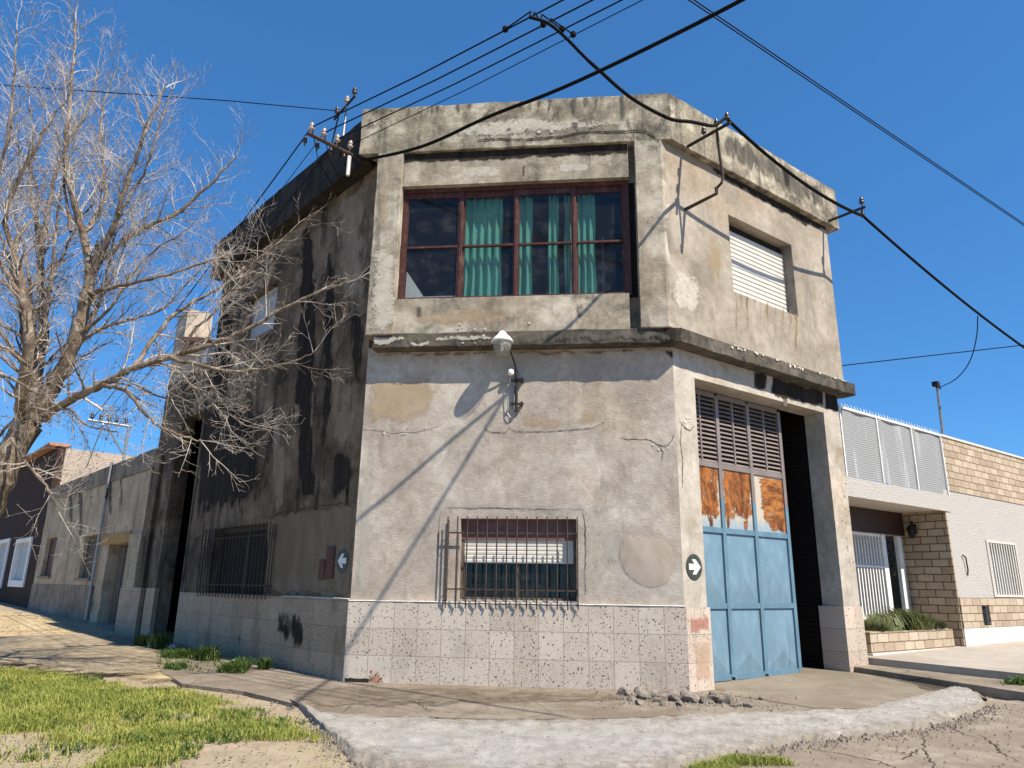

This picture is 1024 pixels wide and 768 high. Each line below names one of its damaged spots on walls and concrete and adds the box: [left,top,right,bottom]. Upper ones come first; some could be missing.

damp [712,167,826,230]
damp [725,136,823,205]
damp [266,186,368,510]
crack [624,422,683,487]
corrosion [699,466,786,532]